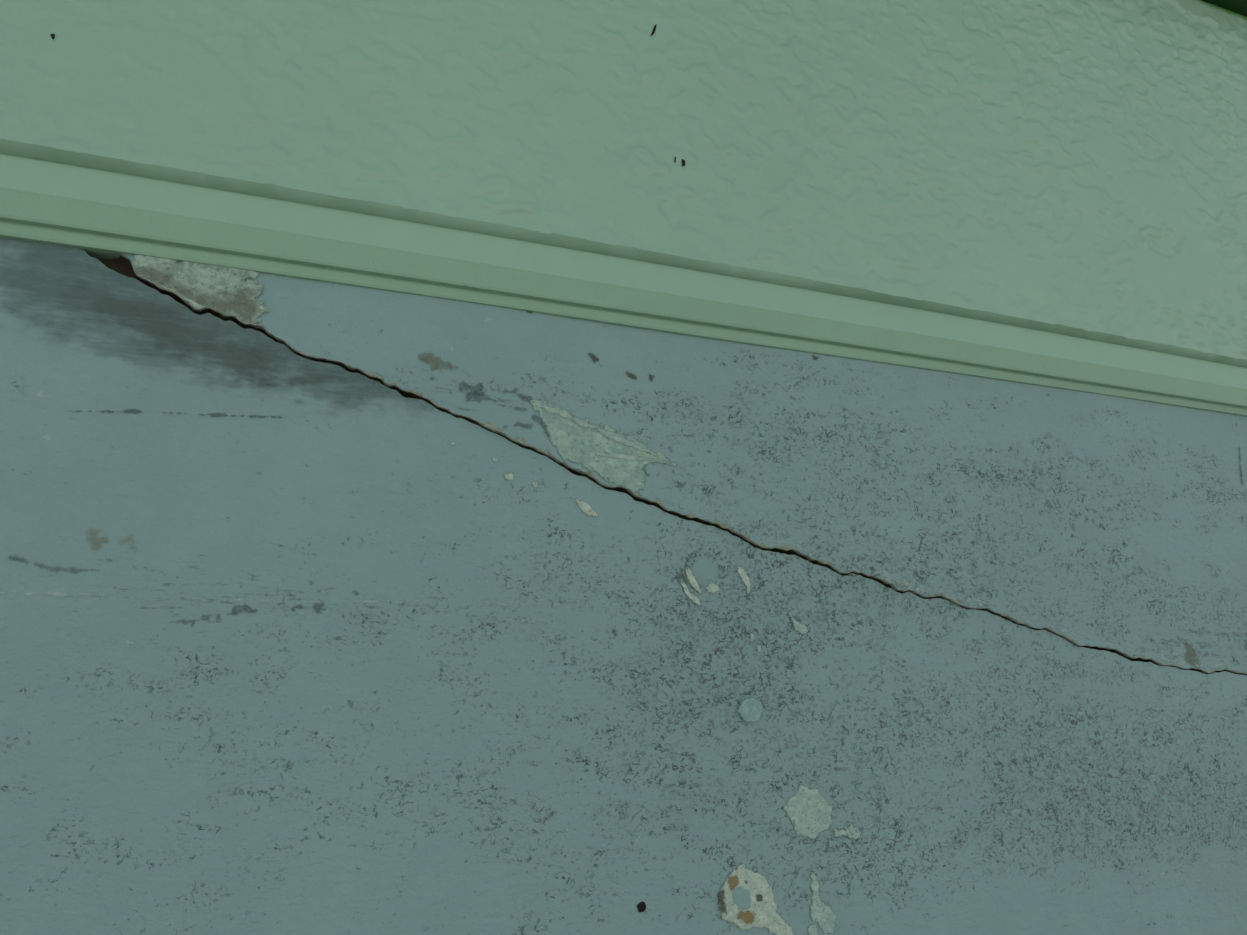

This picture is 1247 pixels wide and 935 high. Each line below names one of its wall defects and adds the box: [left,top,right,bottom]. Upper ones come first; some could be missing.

spalling [132,255,269,324]
peeling [530,399,677,492]
crack [93,253,1247,676]
peeling [783,785,861,839]
peeling [718,864,837,935]